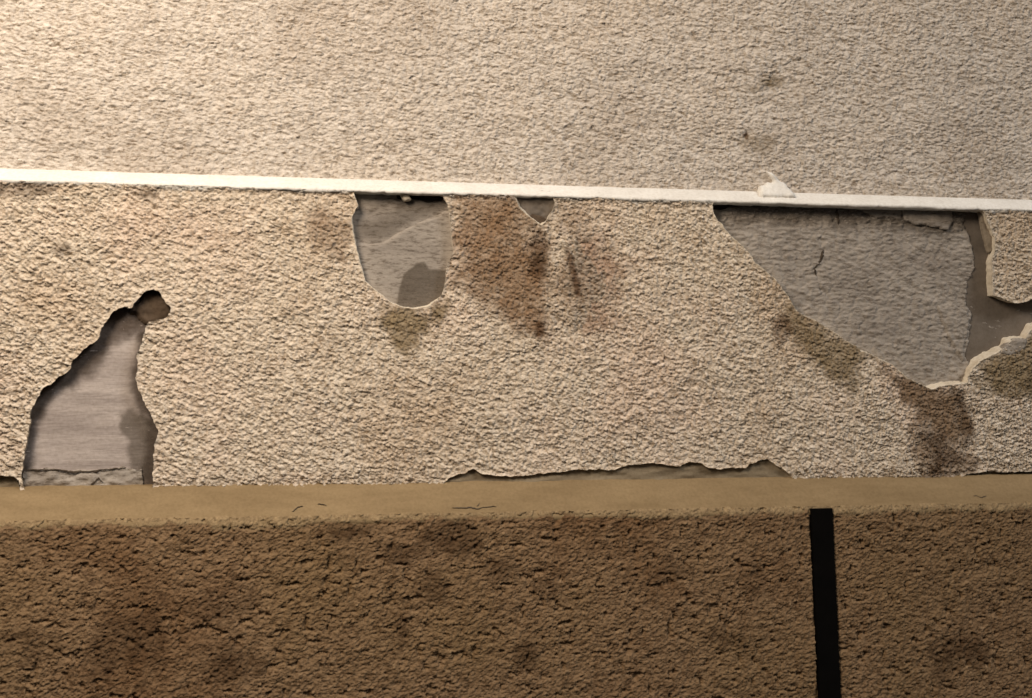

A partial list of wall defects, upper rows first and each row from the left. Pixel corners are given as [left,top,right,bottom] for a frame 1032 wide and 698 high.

spalling [351,193,454,309]
water stain [452,198,546,336]
spalling [515,191,555,225]
spalling [711,203,1032,390]
spalling [0,289,171,487]
spalling [445,459,793,482]
water stain [892,376,972,474]